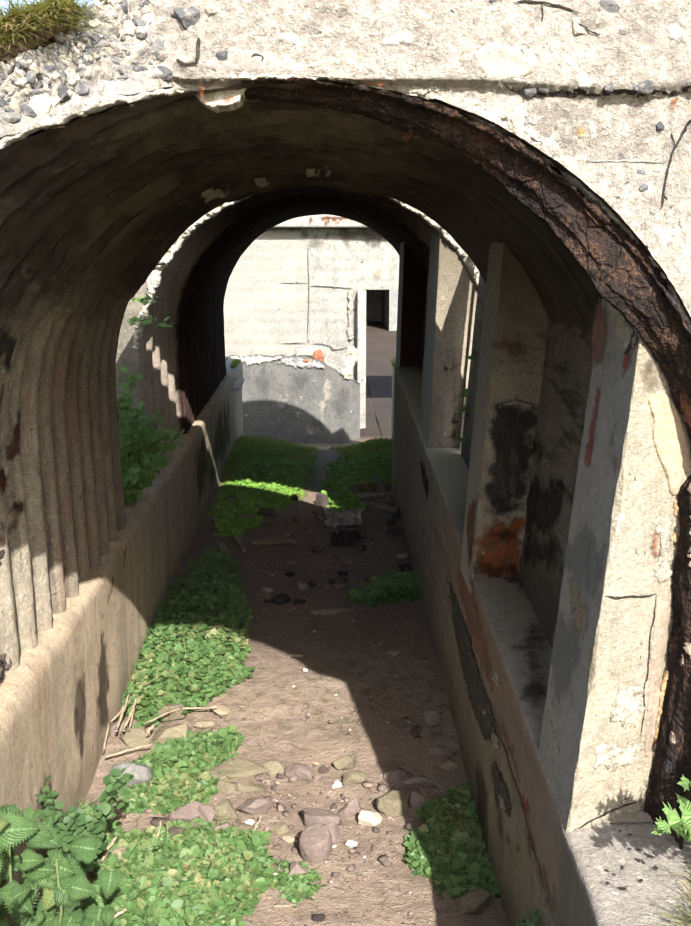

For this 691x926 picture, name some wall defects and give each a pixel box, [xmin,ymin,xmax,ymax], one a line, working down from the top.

crack [504,84,691,98]
spalling [0,42,691,349]
crack [586,119,691,211]
spalling [231,355,324,369]
spalling [341,290,360,380]
rust [591,298,607,363]
rust [467,500,526,578]
leakage [525,475,562,571]
flaking render [594,391,691,771]
spalling [0,653,12,680]
spalling [449,582,499,749]
crack [490,703,552,912]